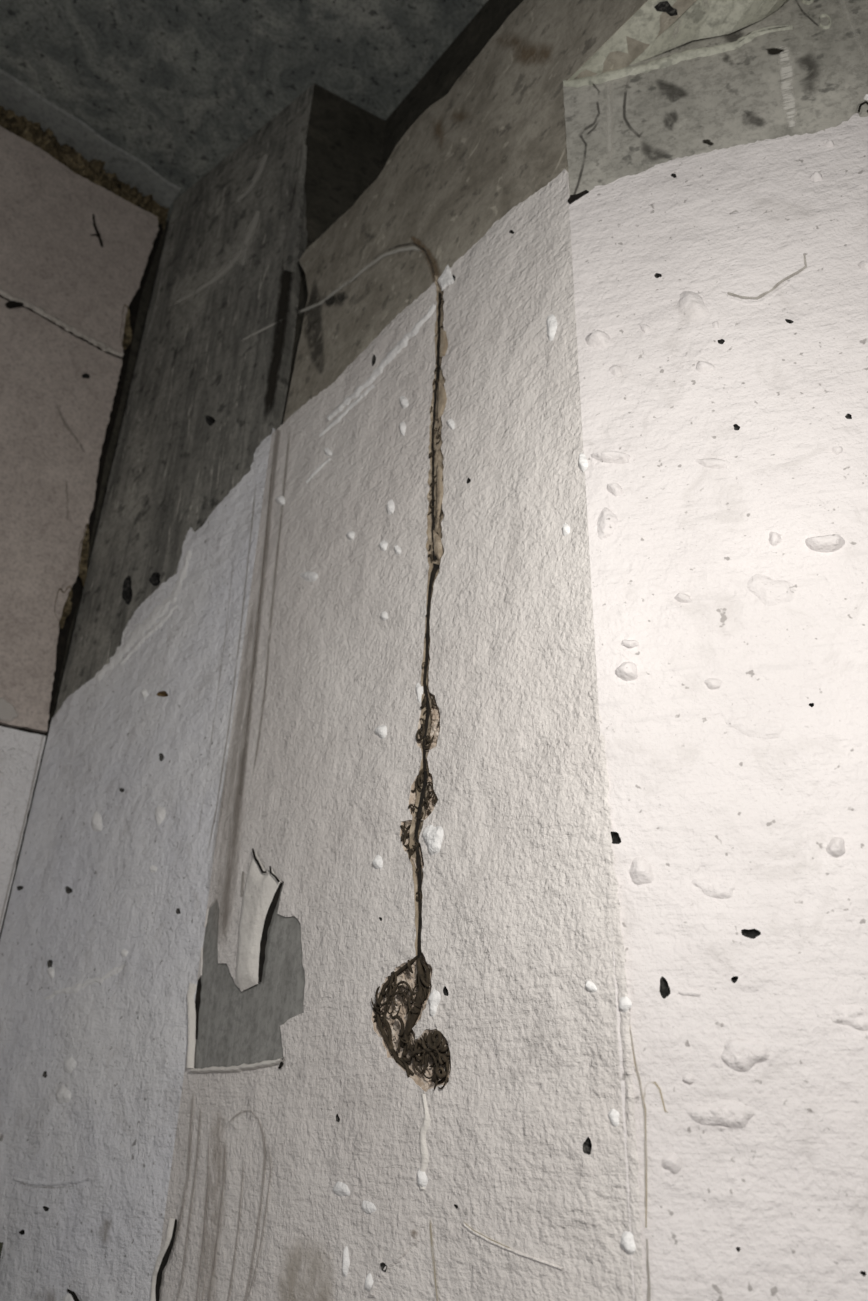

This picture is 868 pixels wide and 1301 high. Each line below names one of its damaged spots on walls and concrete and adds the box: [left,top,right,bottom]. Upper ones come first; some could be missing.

peeling [438,265,454,291]
peeling [568,190,589,204]
crack [47,224,164,732]
crack [408,275,448,958]
peeling [187,848,305,1073]
crack [419,1094,431,1190]